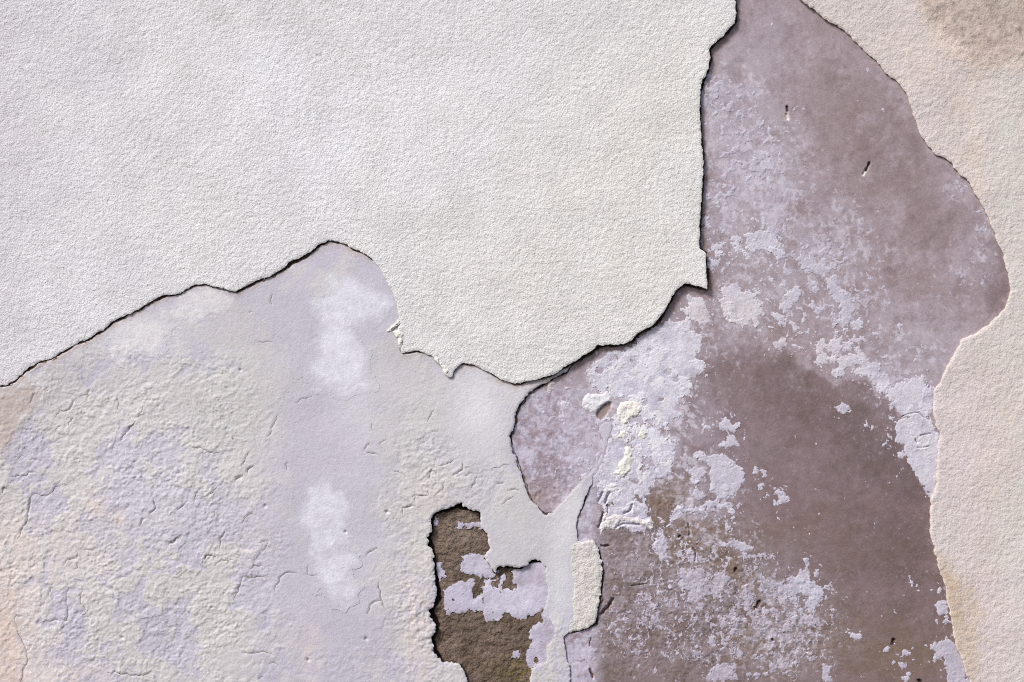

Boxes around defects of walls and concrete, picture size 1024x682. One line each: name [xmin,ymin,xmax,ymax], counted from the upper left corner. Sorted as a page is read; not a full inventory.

spalling [509,0,1010,682]
crack [2,455,64,536]
crack [42,549,89,622]
crack [139,453,314,597]
spalling [0,241,603,682]